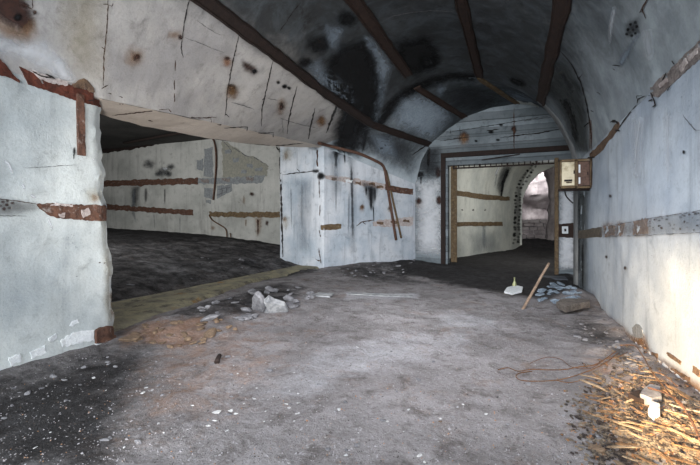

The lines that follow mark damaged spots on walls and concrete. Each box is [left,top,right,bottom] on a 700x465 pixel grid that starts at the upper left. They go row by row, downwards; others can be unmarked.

rust [0,0,36,35]
crack [102,4,113,89]
crack [174,0,275,126]
water stain [312,64,353,104]
water stain [327,29,341,47]
water stain [366,42,389,121]
spalling [649,40,700,107]
spalling [197,140,269,204]
rust [37,197,193,221]
spalling [604,210,700,236]